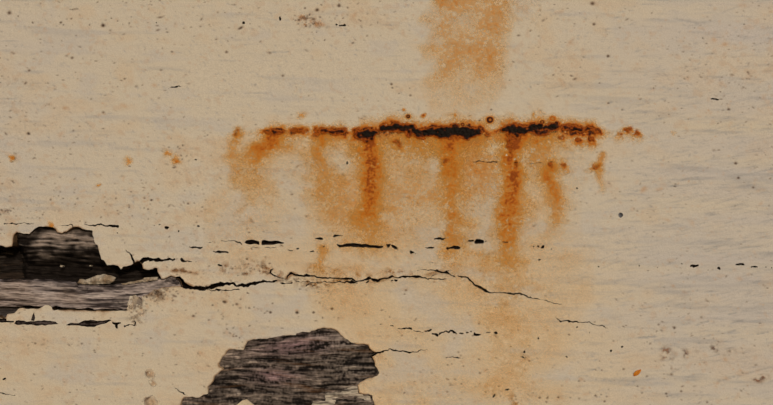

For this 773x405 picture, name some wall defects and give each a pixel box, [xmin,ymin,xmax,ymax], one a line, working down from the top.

corrosion [432,0,503,77]
corrosion [617,127,642,138]
corrosion [229,108,605,267]
peeling [0,226,183,318]
crack [61,223,606,328]
crack [681,262,772,270]
peeling [181,328,379,405]